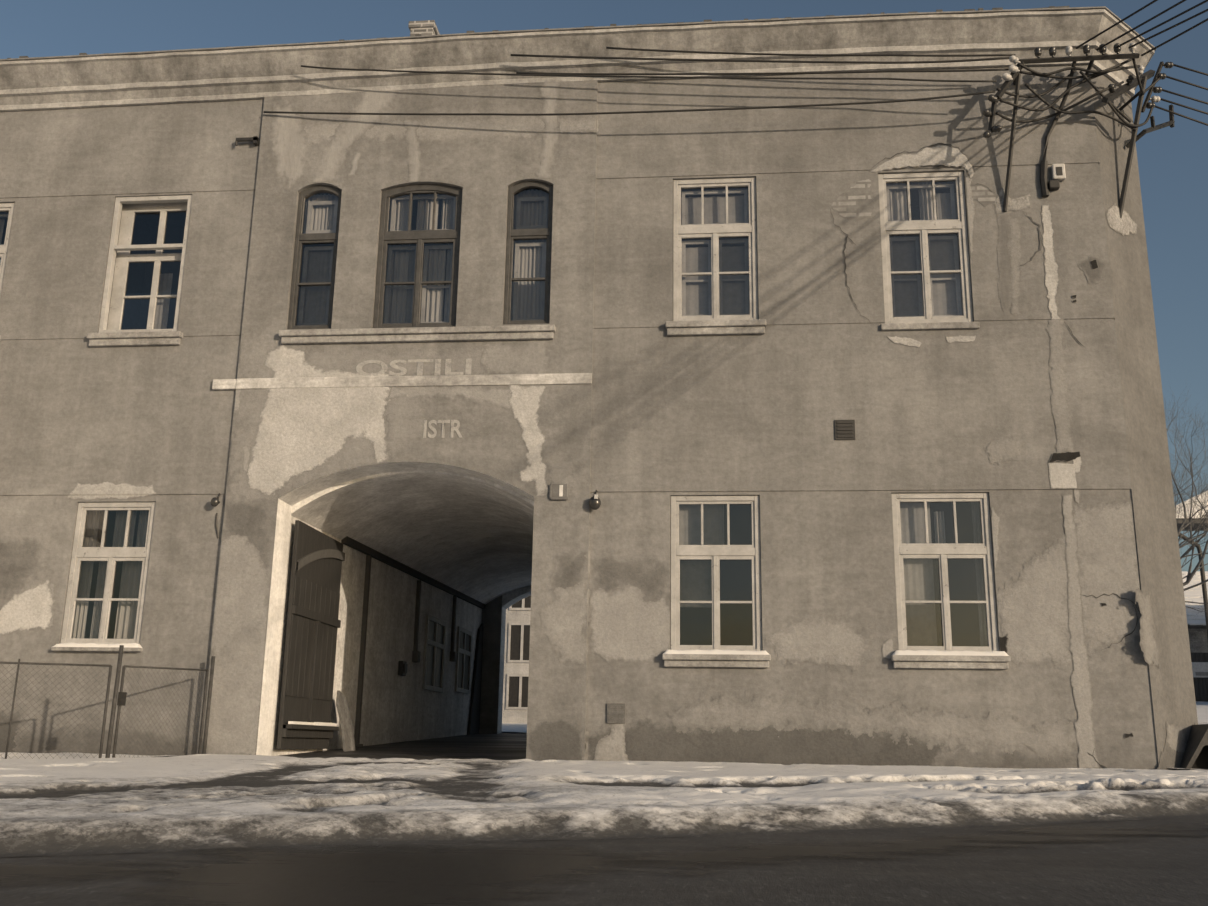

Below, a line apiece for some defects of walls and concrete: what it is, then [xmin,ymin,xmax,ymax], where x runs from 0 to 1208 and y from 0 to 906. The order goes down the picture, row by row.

flaking render [829,179,874,322]
flaking render [1106,202,1138,236]
flaking render [222,341,491,516]
flaking render [508,385,578,497]
flaking render [0,579,56,635]